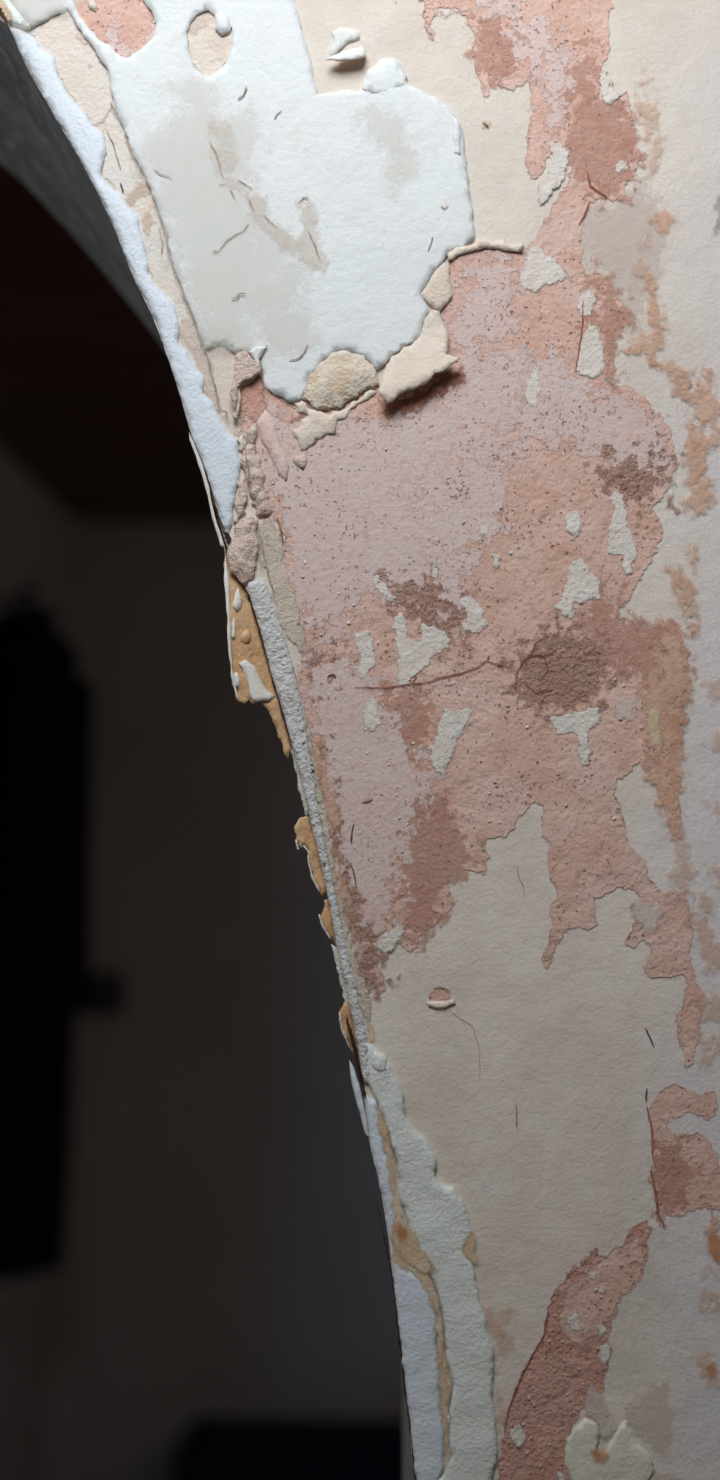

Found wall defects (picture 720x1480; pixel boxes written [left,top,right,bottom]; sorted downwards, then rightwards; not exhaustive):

peeling [2,0,705,1068]
crack [355,635,556,693]
peeling [497,1084,720,1480]